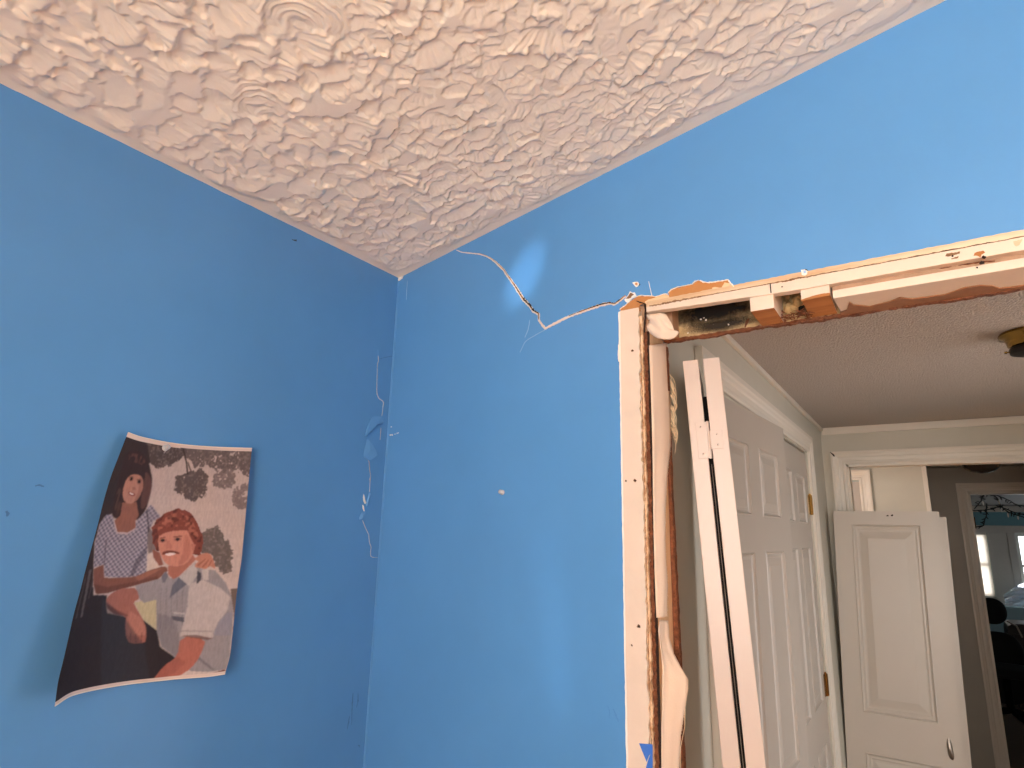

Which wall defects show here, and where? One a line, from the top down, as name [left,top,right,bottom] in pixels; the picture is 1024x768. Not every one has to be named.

crack [457,250,626,352]
crack [359,353,391,558]
peeling [618,279,734,768]